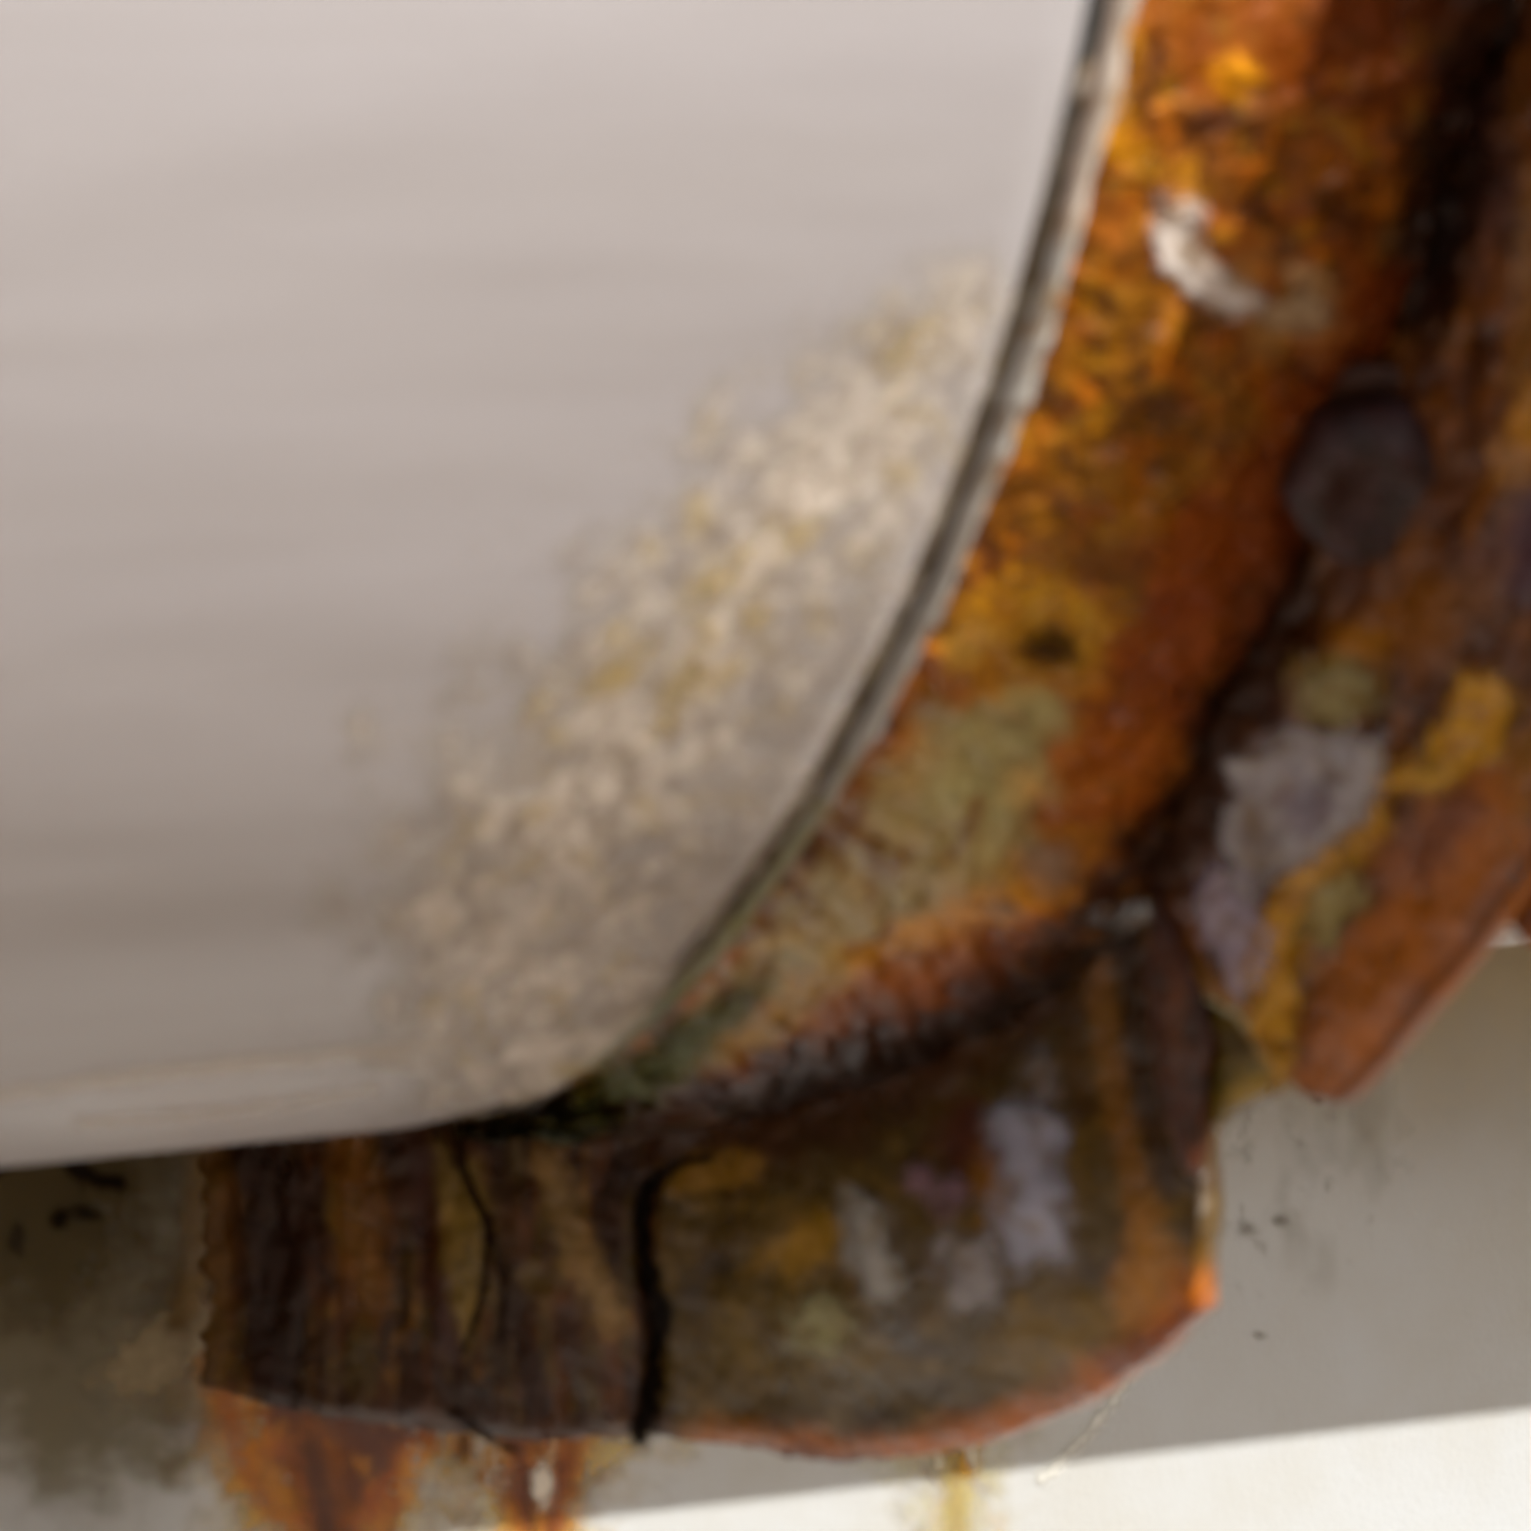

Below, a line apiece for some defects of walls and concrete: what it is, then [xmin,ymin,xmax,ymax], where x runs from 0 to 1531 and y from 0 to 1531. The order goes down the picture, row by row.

rust [404,0,1531,1167]
water stain [172,1147,210,1328]
rust [172,1343,628,1531]